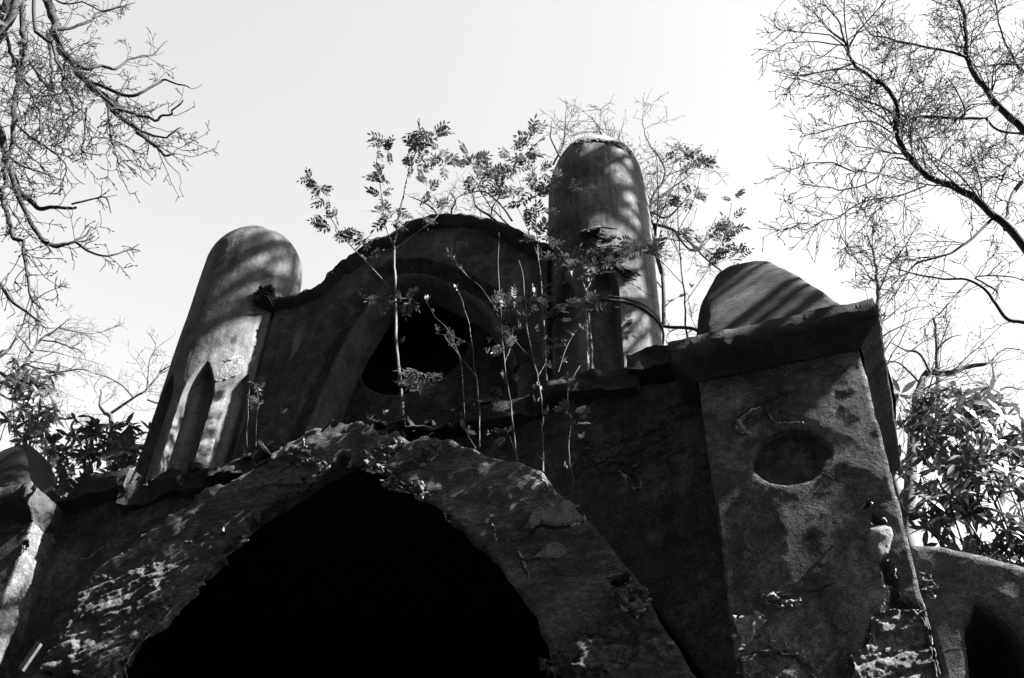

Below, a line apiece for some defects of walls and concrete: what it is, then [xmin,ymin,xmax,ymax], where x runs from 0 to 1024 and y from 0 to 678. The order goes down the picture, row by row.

crack [737,392,804,424]
spalling [346,437,441,501]
flaking render [525,479,586,529]
flaking render [532,541,566,559]
flaking render [731,591,816,678]
flaking render [845,560,944,678]